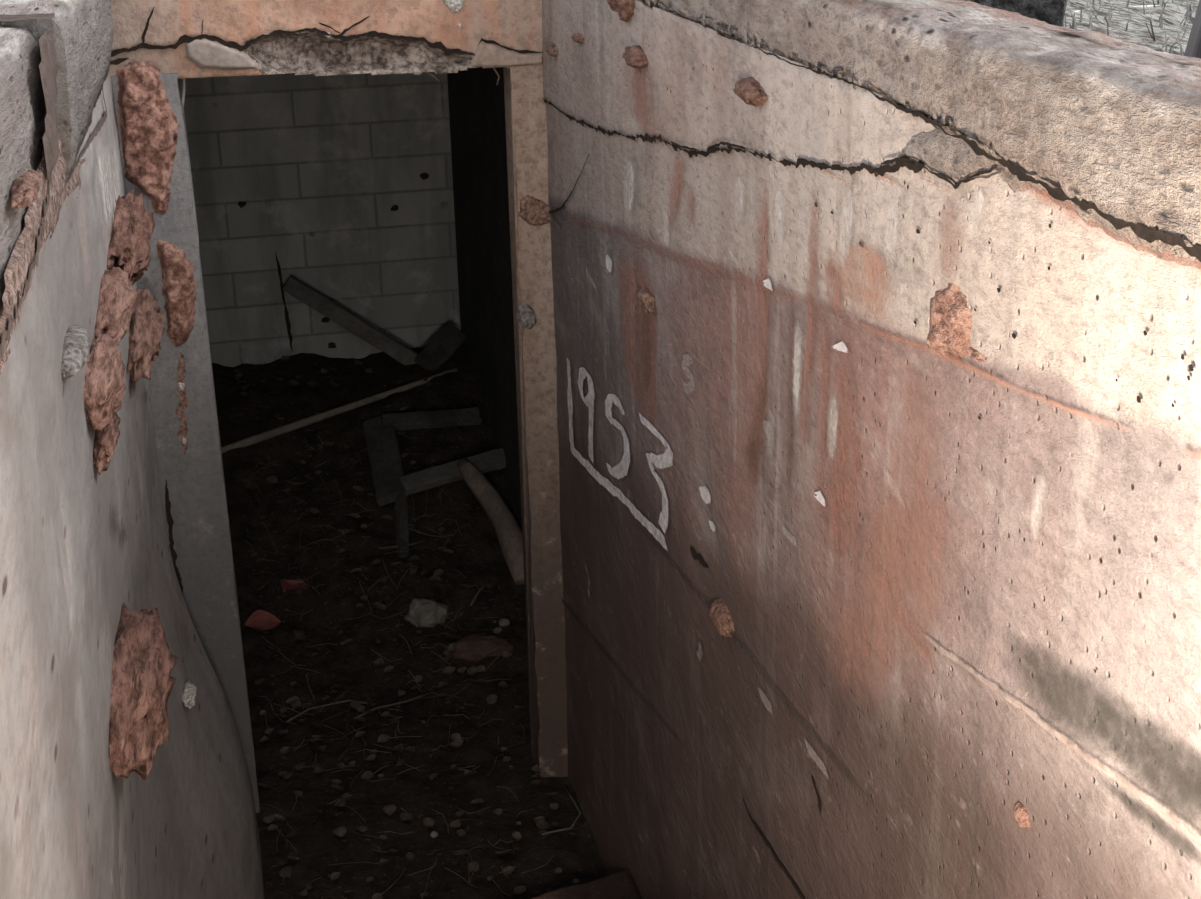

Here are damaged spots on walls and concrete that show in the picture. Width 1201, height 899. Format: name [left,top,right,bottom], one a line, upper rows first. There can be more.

spalling [185,28,543,76]
crack [542,0,1201,262]
corrosion [787,219,828,455]
corrosion [864,325,1101,422]
damp [1025,652,1201,811]
damp [1111,790,1195,859]